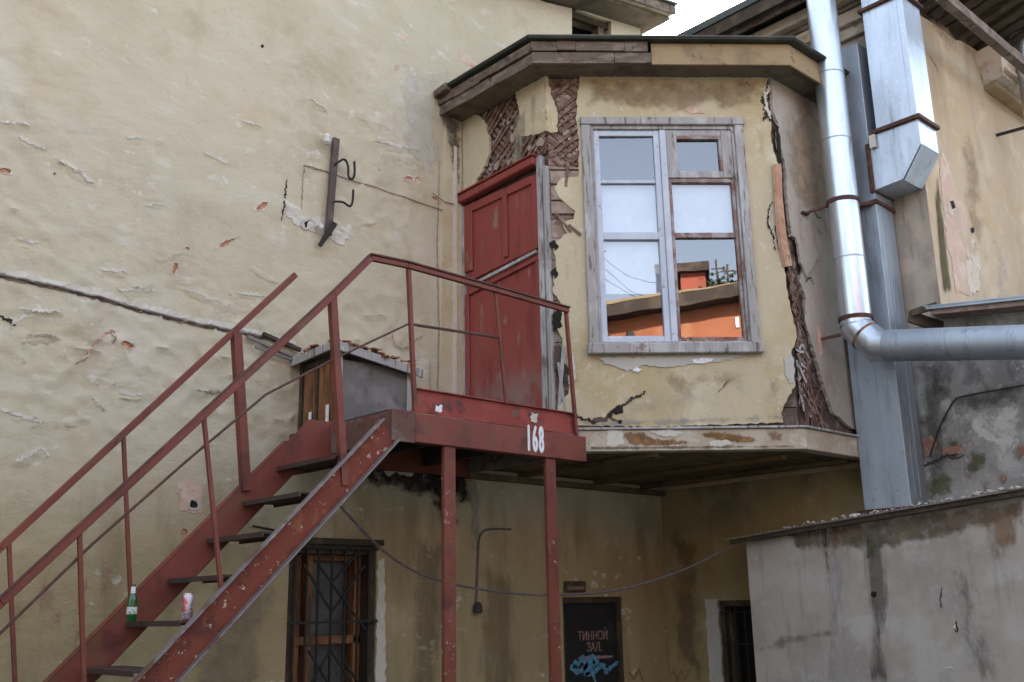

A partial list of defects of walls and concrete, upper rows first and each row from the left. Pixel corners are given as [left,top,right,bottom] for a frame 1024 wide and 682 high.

crack [281,168,305,220]
spalling [284,198,354,245]
spalling [550,163,581,236]
flaking render [772,164,819,277]
peeling [939,151,981,296]
crack [75,329,117,364]
flaking render [598,354,753,372]
crack [577,391,646,424]
peeling [703,432,754,447]
leakage [921,366,945,480]
leakage [432,478,441,510]
leakage [792,502,1020,680]